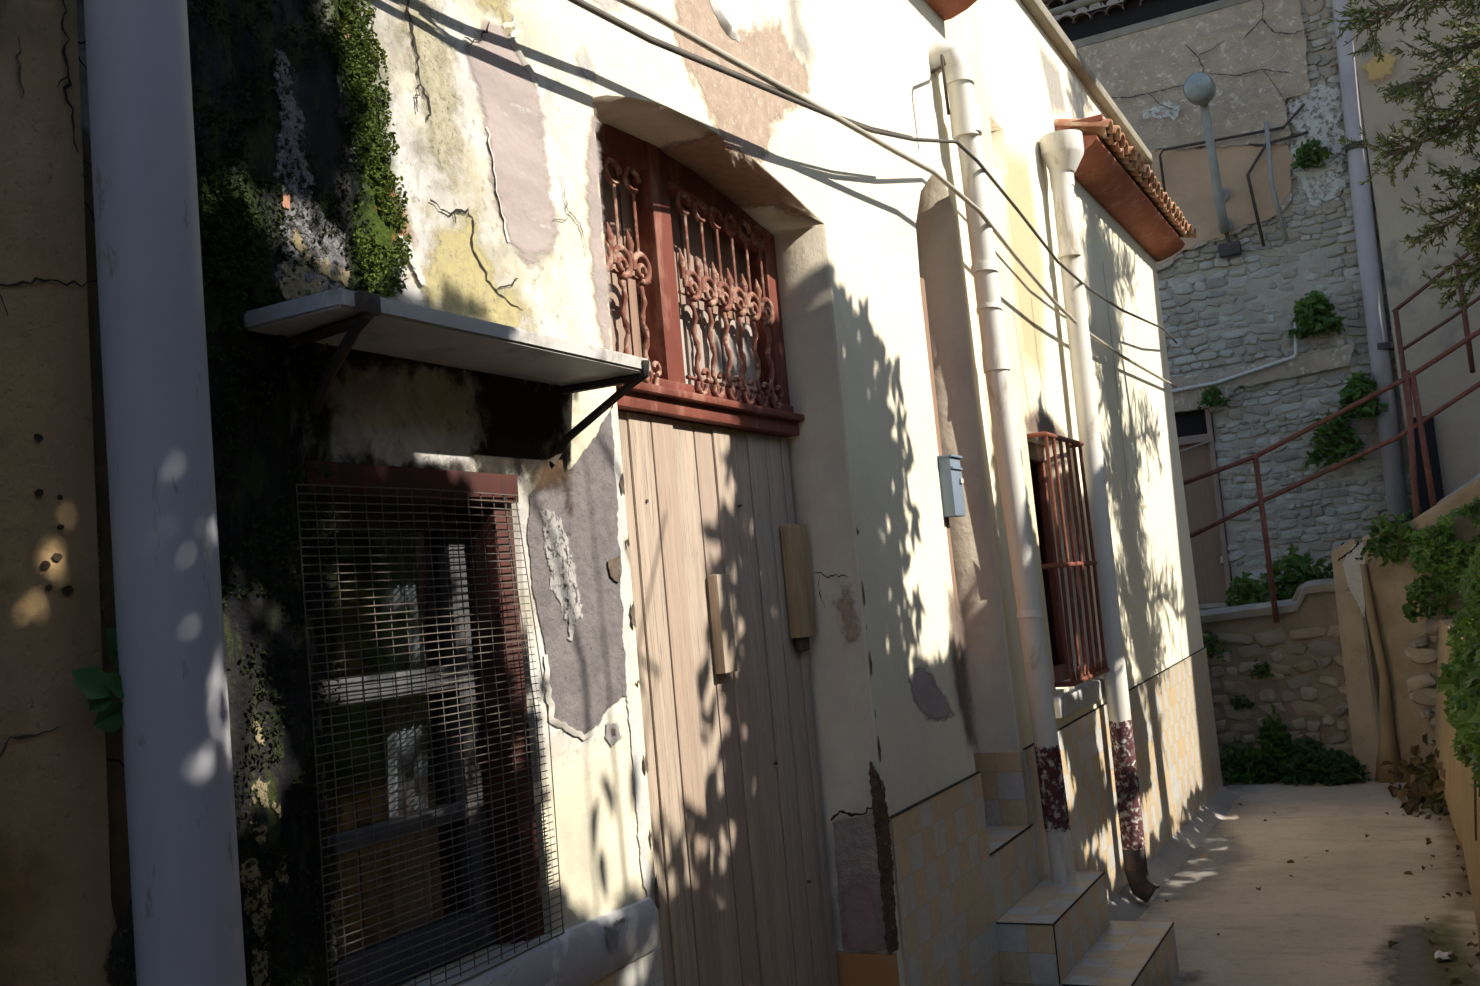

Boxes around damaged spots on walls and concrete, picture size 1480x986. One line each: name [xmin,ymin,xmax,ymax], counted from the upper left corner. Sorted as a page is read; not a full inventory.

crack [15,0,92,167]
crack [406,0,431,120]
peeling [464,15,559,265]
peeling [674,0,810,163]
crack [0,277,98,317]
crack [430,199,522,310]
mould [187,0,578,986]
crack [0,726,59,758]
spalling [527,406,660,910]
peeling [909,667,954,721]
spalling [831,736,899,955]